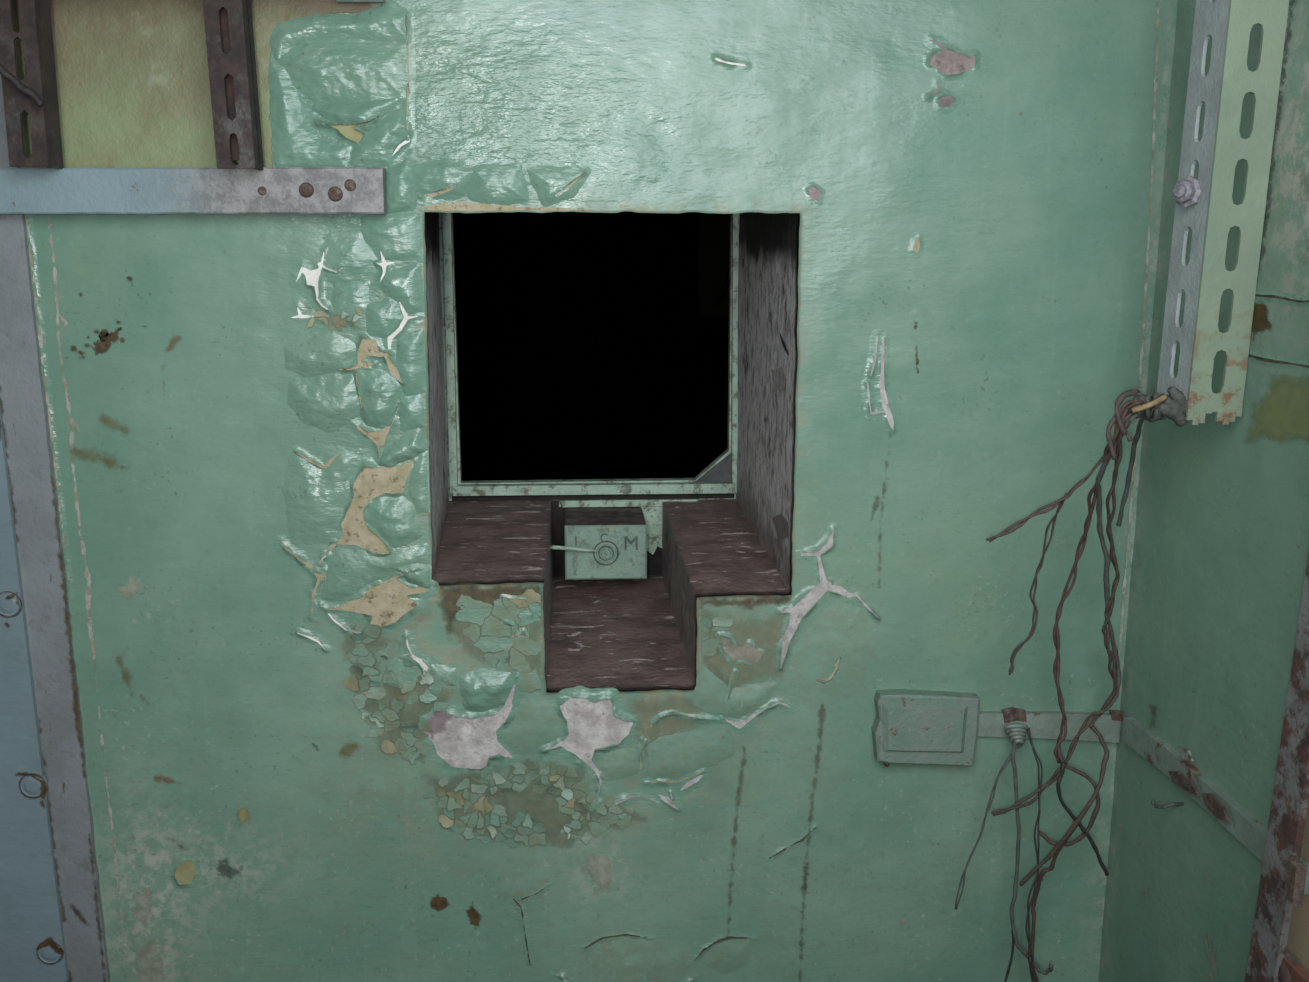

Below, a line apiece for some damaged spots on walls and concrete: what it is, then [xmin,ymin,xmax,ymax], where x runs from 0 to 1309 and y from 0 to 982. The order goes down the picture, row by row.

peeling [921,33,982,114]
rust [71,321,124,355]
peeling [860,328,900,436]
rust [0,398,18,541]
rust [59,540,86,777]
peeling [272,240,643,848]
peeling [702,514,886,674]
rust [1168,747,1230,822]
rust [16,759,106,982]